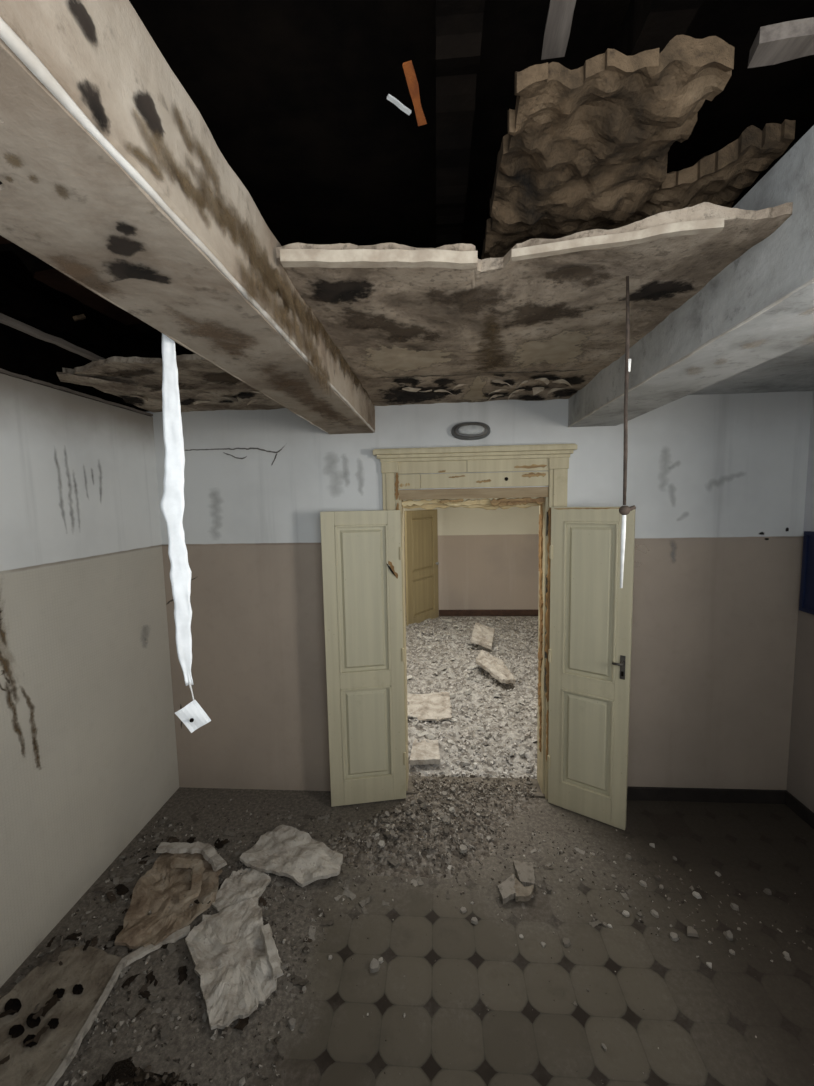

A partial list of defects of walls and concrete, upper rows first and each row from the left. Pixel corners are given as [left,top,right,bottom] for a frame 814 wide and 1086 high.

spalling [68,0,98,45]
spalling [79,80,109,133]
spalling [134,90,165,139]
leakage [103,222,171,284]
leakage [128,107,469,405]
leakage [546,265,611,287]
leakage [621,281,695,302]
leakage [430,287,593,370]
leakage [105,369,162,392]
flaking render [360,344,454,372]
flaking render [462,329,593,403]
crack [184,448,282,464]